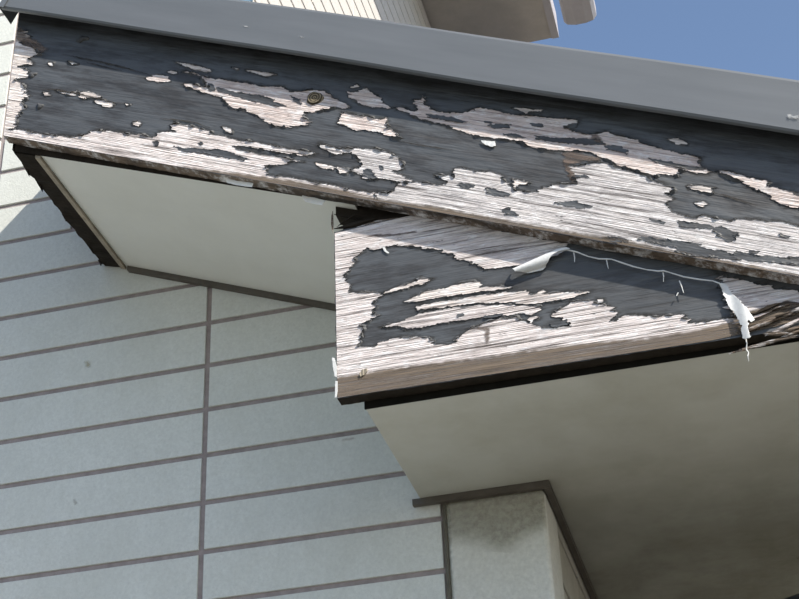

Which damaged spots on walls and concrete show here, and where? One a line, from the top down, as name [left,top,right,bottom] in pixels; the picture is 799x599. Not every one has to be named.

peeling [4,30,799,378]